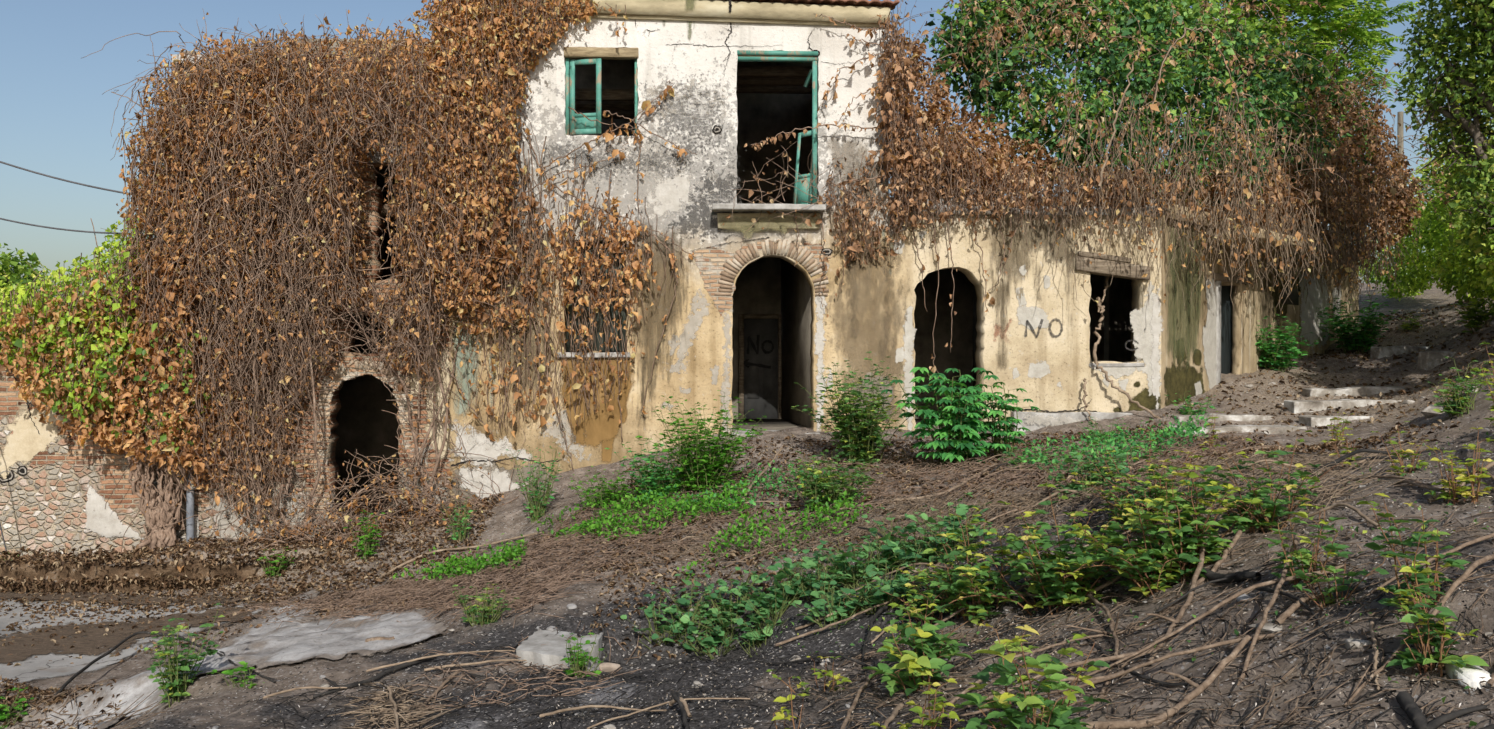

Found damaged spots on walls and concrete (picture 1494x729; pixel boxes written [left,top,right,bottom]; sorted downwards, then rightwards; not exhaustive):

water stain [565,138,819,401]
water stain [1168,228,1203,366]
peeling [0,380,71,479]
peeling [194,346,550,539]
peeling [542,410,591,462]